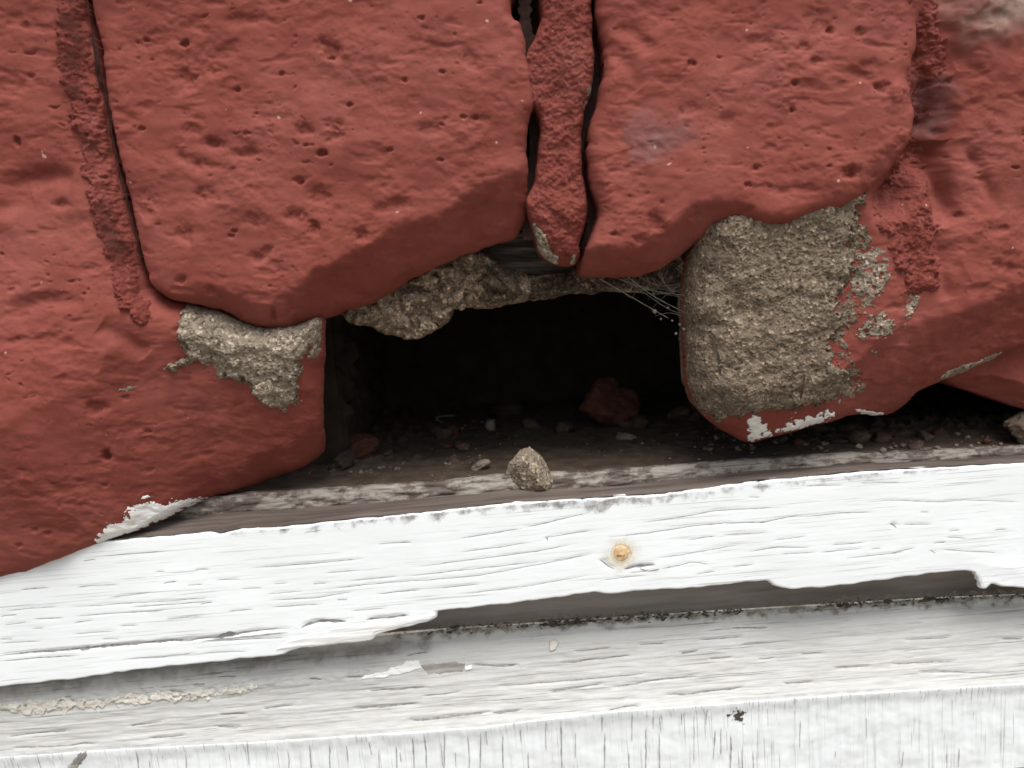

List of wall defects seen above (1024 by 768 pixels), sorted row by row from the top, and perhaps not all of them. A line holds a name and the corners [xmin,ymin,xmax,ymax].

crack [517,0,535,56]
crack [84,0,149,280]
crack [522,114,539,240]
crack [580,30,600,249]
spalling [163,302,323,412]
spalling [340,191,925,424]
peeling [161,474,522,521]
peeling [550,445,1024,489]
peeling [276,613,437,651]
peeling [360,660,472,679]